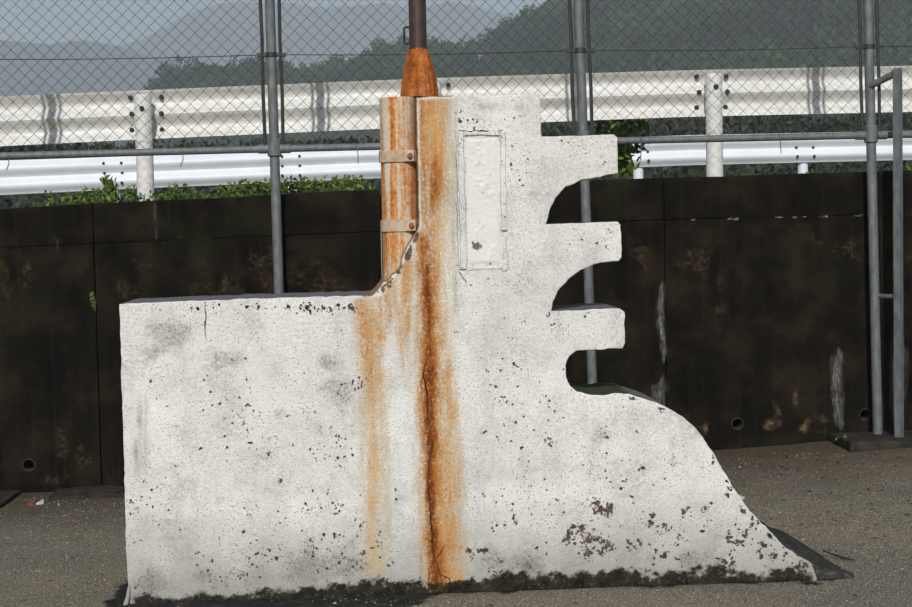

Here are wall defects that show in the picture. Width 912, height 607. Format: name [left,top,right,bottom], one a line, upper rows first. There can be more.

spalling [377,232,419,293]
corrosion [357,100,463,590]
crack [421,363,429,420]
water stain [831,352,844,426]
crack [426,441,451,582]